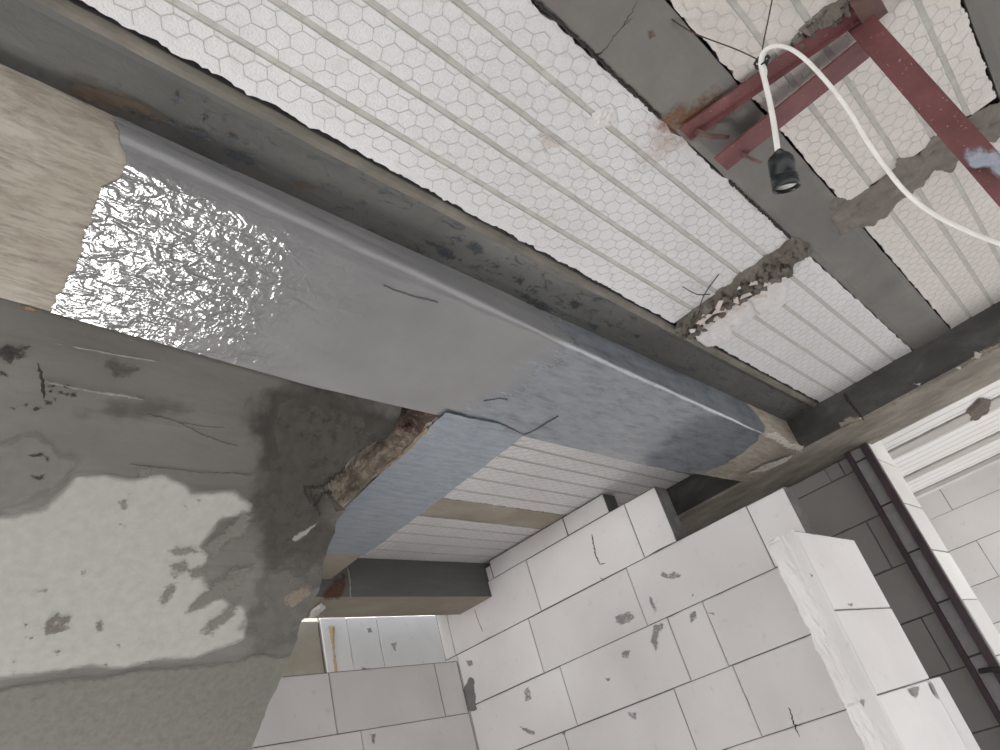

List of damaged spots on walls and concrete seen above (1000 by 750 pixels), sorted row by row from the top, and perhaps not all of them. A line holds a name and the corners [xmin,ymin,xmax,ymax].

crack [533,0,661,118]
corrosion [658,93,722,132]
crack [729,180,791,239]
crack [37,363,46,399]
crack [129,464,252,476]
crack [147,414,237,446]
spalling [326,407,437,506]
damp [0,391,398,750]